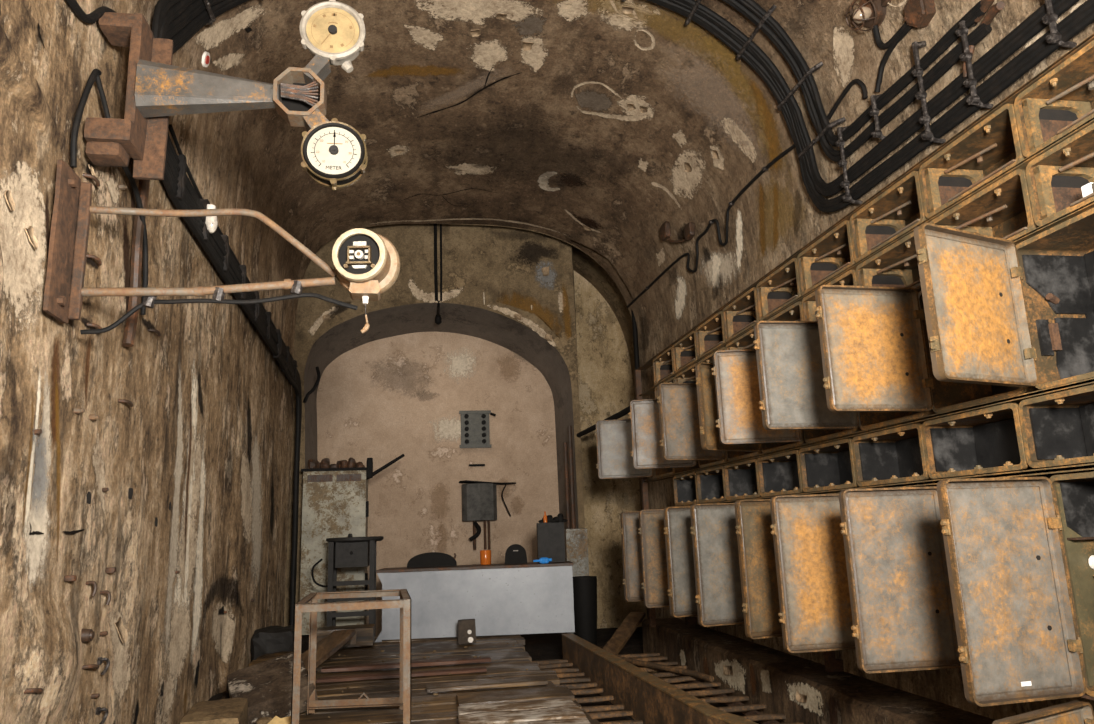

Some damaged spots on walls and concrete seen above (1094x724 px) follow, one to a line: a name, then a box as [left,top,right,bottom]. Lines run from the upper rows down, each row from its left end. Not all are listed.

flaking render [404,0,660,72]
flaking render [833,25,854,87]
crack [417,67,522,118]
flaking render [722,118,757,163]
flaking render [638,130,724,210]
flaking render [0,161,47,331]
peeling [714,659,746,694]
peeling [761,670,771,693]
peeling [785,681,824,716]